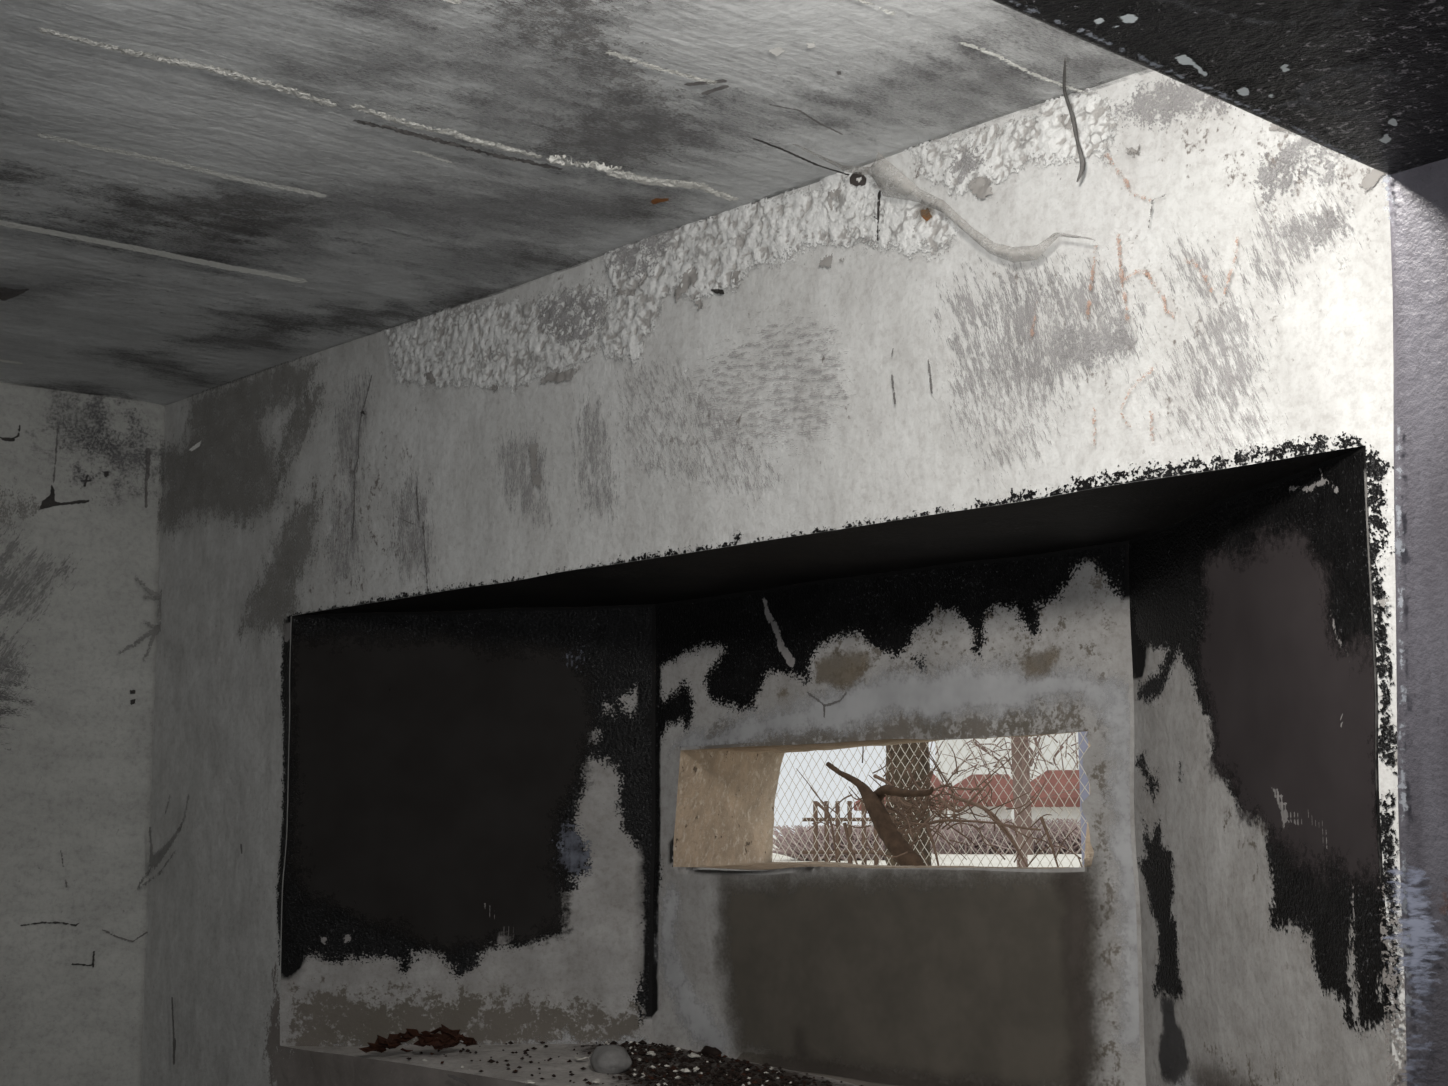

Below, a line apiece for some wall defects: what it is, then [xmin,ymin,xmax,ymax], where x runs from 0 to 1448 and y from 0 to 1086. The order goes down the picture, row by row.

peeling [1094,14,1138,27]
peeling [381,55,1249,525]
peeling [1235,123,1394,307]
peeling [1379,118,1398,144]
peeling [283,452,1407,1086]